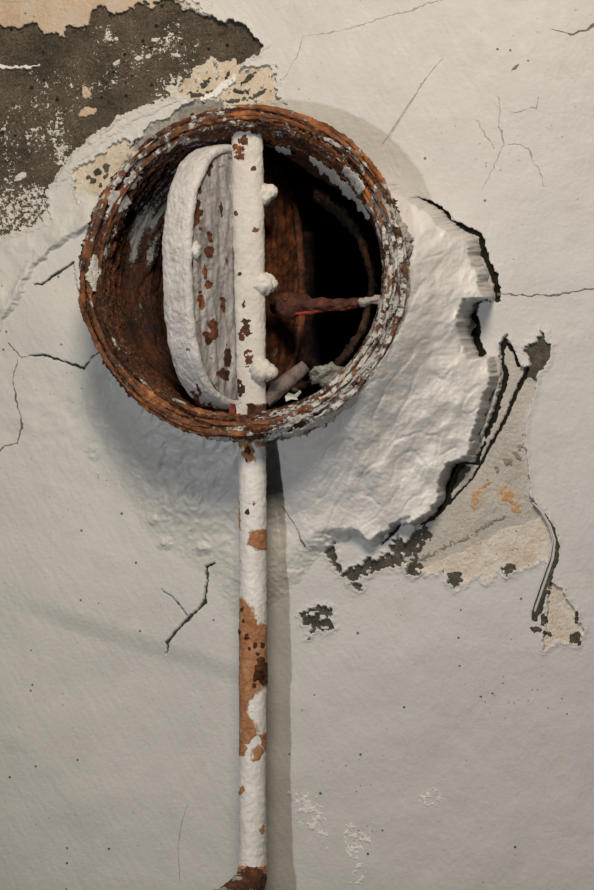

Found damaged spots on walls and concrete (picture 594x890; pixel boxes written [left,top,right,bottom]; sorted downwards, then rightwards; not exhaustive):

crack [275,0,442,105]
crack [552,23,594,36]
spalling [0,0,279,236]
crack [34,261,79,291]
corrosion [78,104,408,464]
crack [0,342,99,451]
peeling [283,353,380,438]
corrosion [238,501,268,551]
spalling [325,332,584,650]
crack [166,562,215,652]
spalling [300,605,334,640]
corrosion [238,596,268,762]